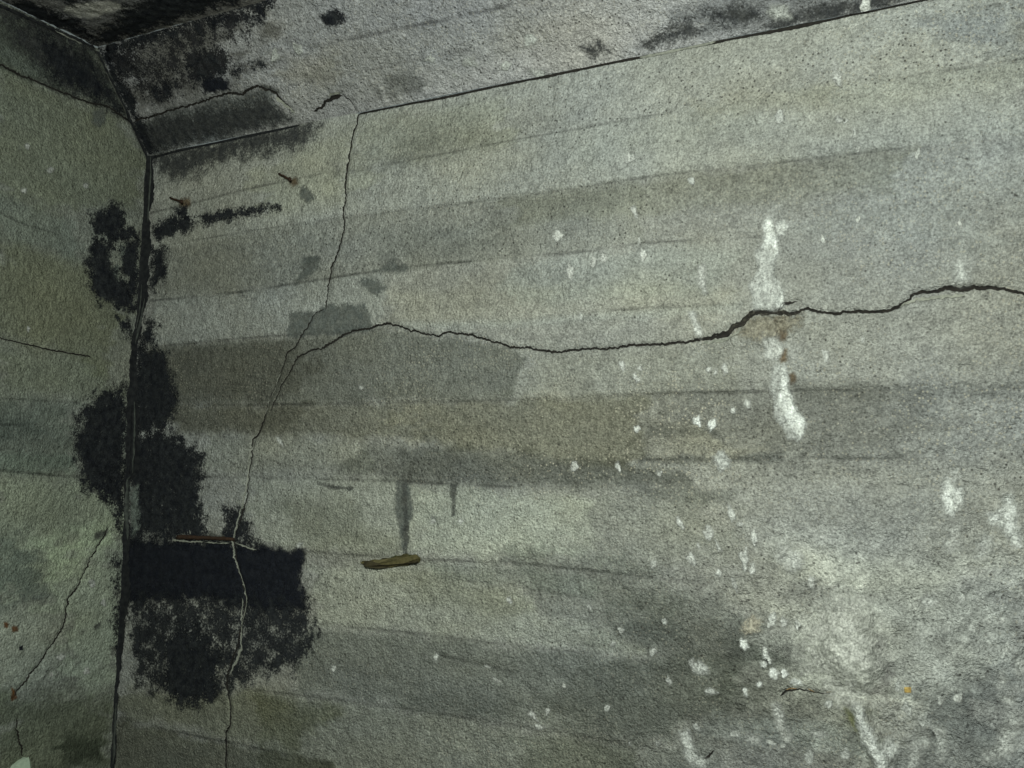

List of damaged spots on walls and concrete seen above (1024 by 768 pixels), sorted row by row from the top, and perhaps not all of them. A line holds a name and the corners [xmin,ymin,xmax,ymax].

leakage [0,0,323,184]
crack [0,4,299,768]
leakage [71,200,323,713]
leakage [395,481,413,554]
crack [225,0,1024,768]